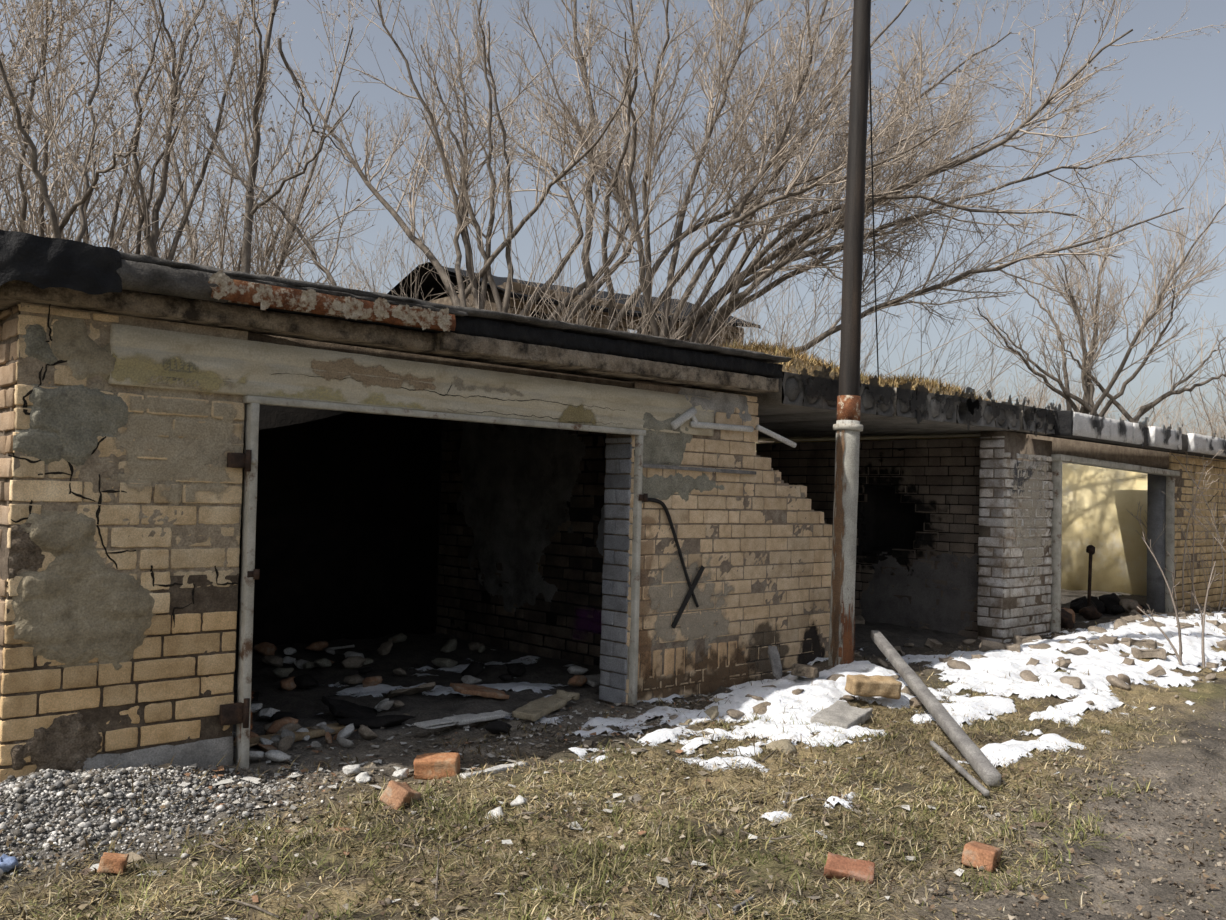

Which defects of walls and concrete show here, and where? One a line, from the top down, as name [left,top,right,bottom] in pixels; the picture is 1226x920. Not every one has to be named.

peeling [311,358,436,390]
crack [8,436,136,569]
spalling [5,523,45,587]
spalling [10,710,103,773]